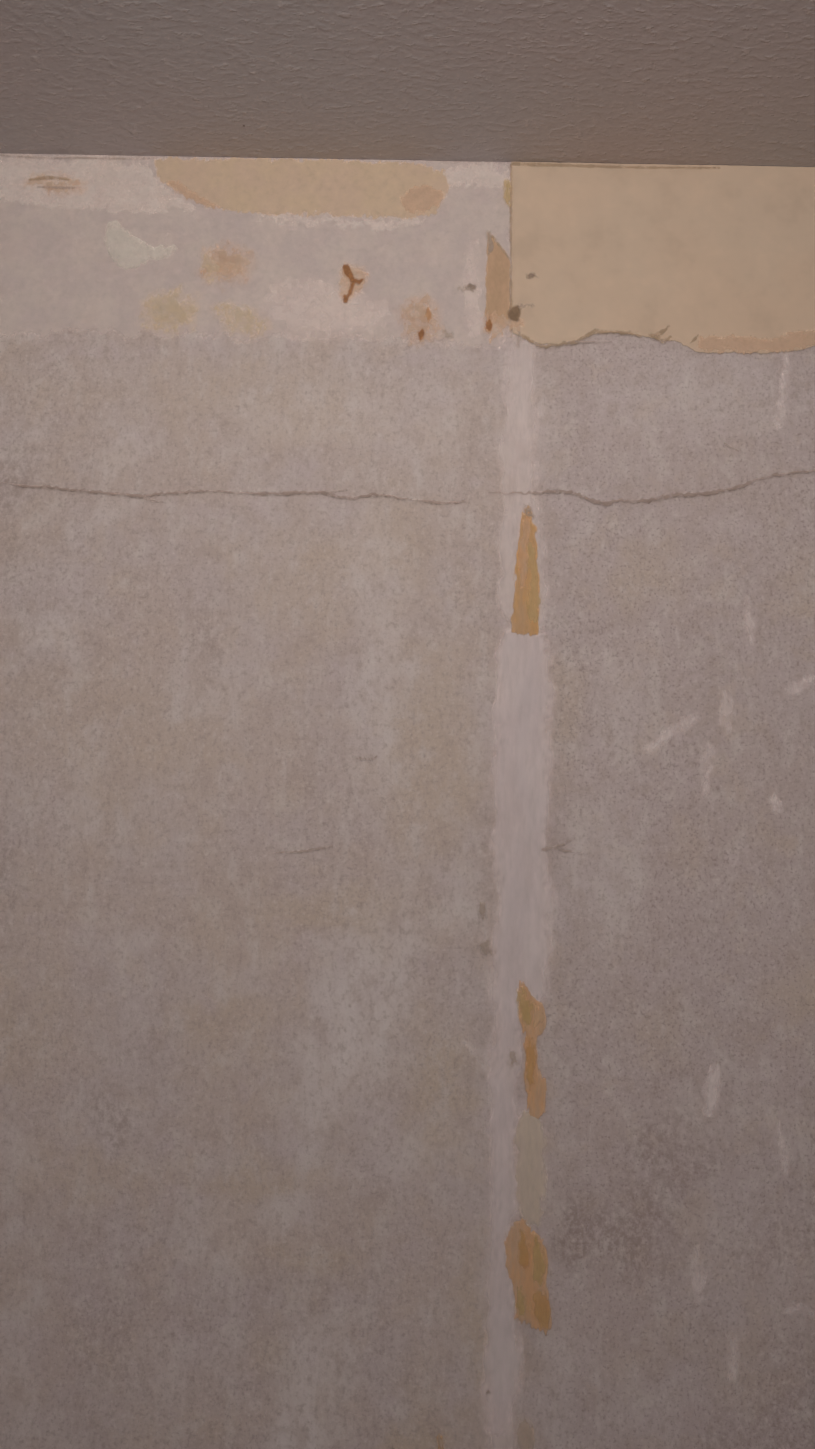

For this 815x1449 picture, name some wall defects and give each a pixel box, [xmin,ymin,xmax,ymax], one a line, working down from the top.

rust [340,265,364,303]
peeling [0,153,815,354]
crack [18,485,458,504]
crack [512,470,815,506]
peeling [511,506,540,636]
peeling [518,982,546,1118]
peeling [504,1219,552,1335]